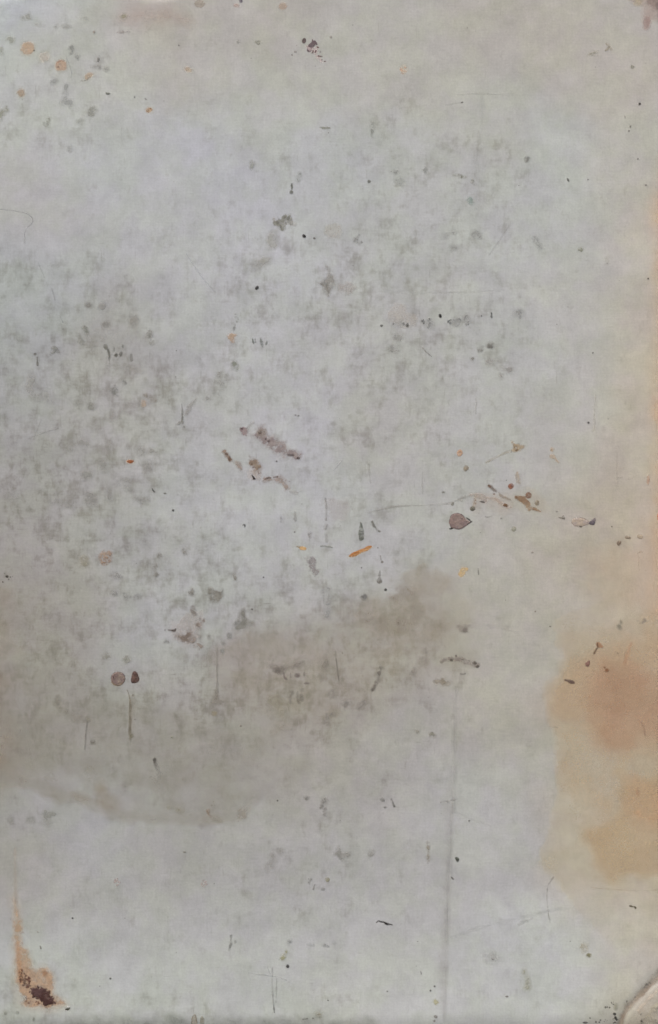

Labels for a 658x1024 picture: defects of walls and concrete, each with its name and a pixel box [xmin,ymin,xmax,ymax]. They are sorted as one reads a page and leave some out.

damp [170,610,205,648]
corrosion [15,912,63,1007]